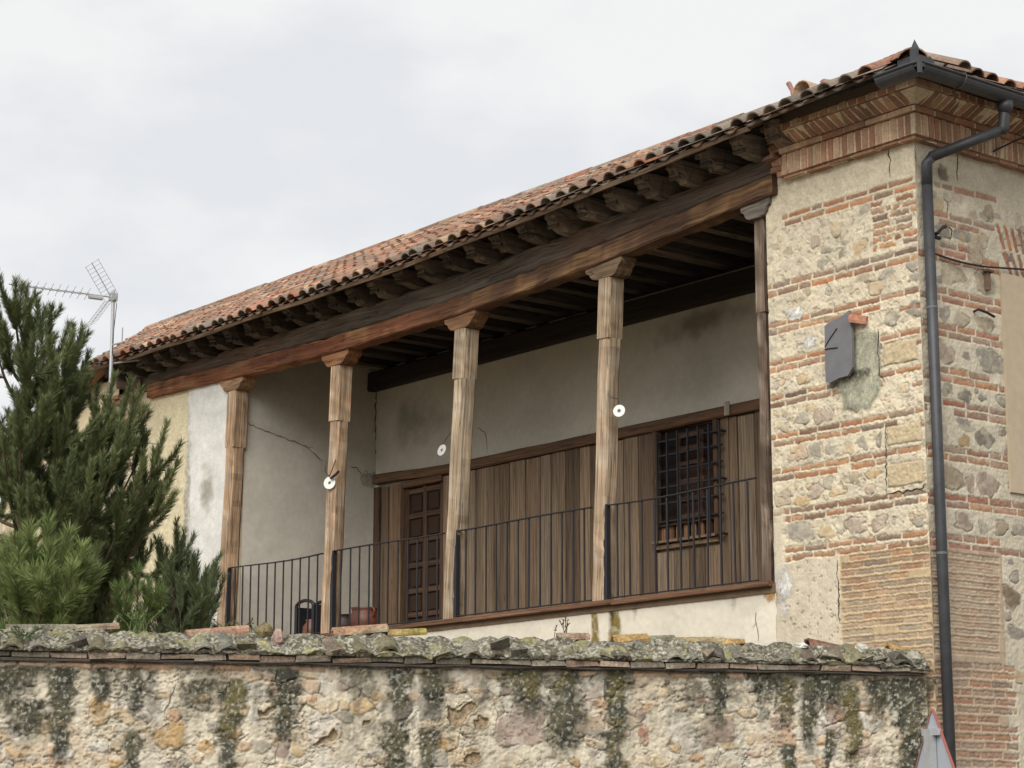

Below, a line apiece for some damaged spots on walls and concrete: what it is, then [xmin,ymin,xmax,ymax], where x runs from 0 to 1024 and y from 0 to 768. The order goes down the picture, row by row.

crack [248,422,324,462]
crack [885,426,925,496]
crack [834,562,842,623]
damp [0,667,78,757]
damp [90,668,151,715]
damp [122,730,146,768]
damp [183,679,247,768]
damp [266,669,301,739]
damp [378,668,444,768]
damp [492,670,584,751]
damp [600,670,628,768]
damp [744,673,938,768]